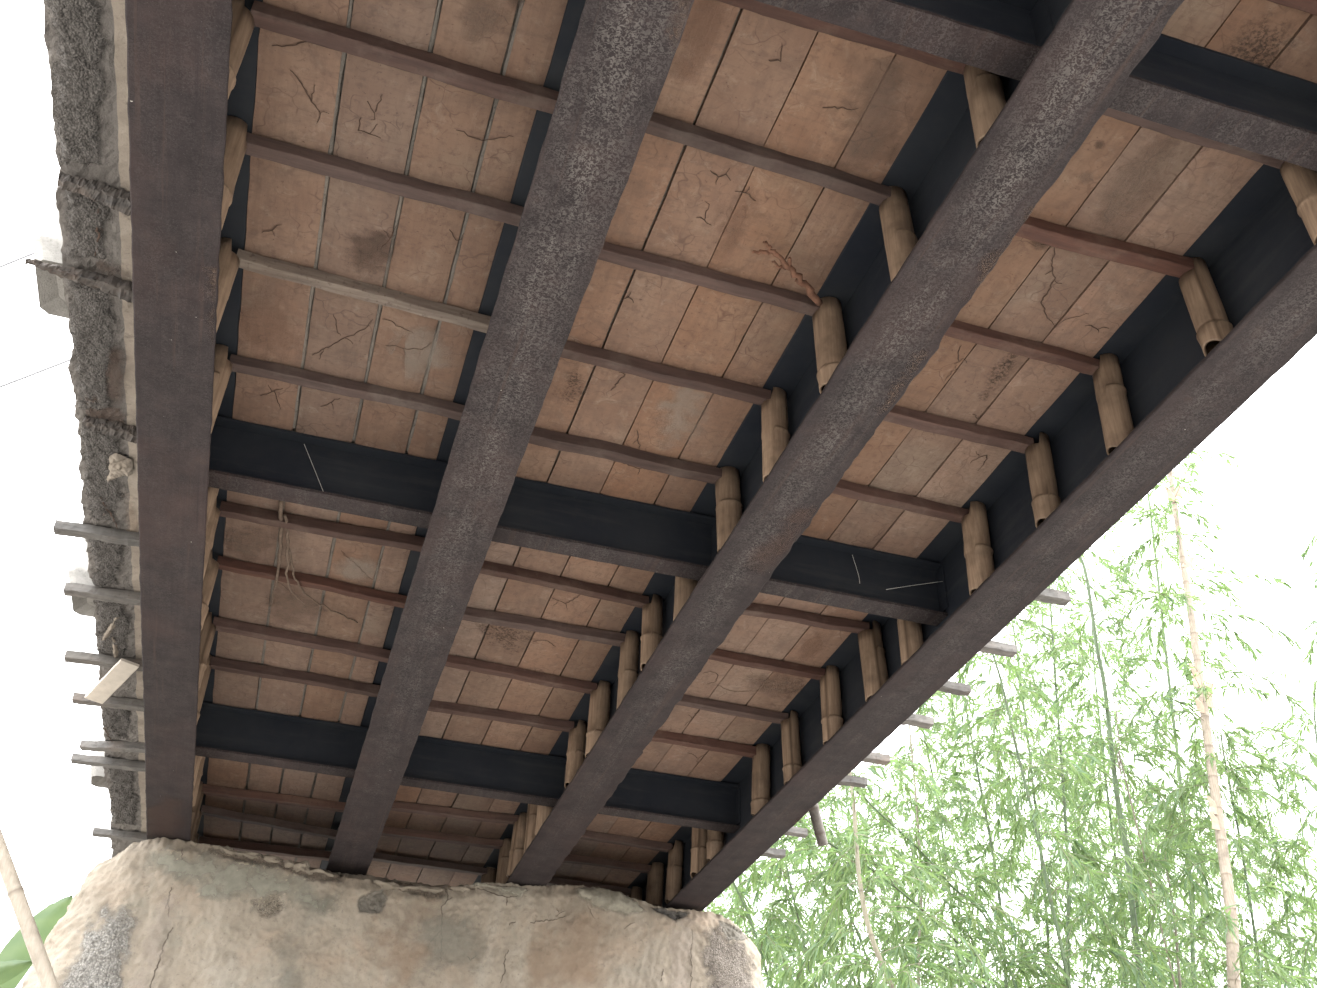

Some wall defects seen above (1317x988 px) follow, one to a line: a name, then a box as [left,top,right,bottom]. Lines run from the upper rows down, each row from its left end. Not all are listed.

crack [272,41,329,123]
crack [357,95,382,138]
crack [457,130,513,141]
crack [697,168,756,225]
crack [1040,247,1107,332]
crack [313,314,432,358]